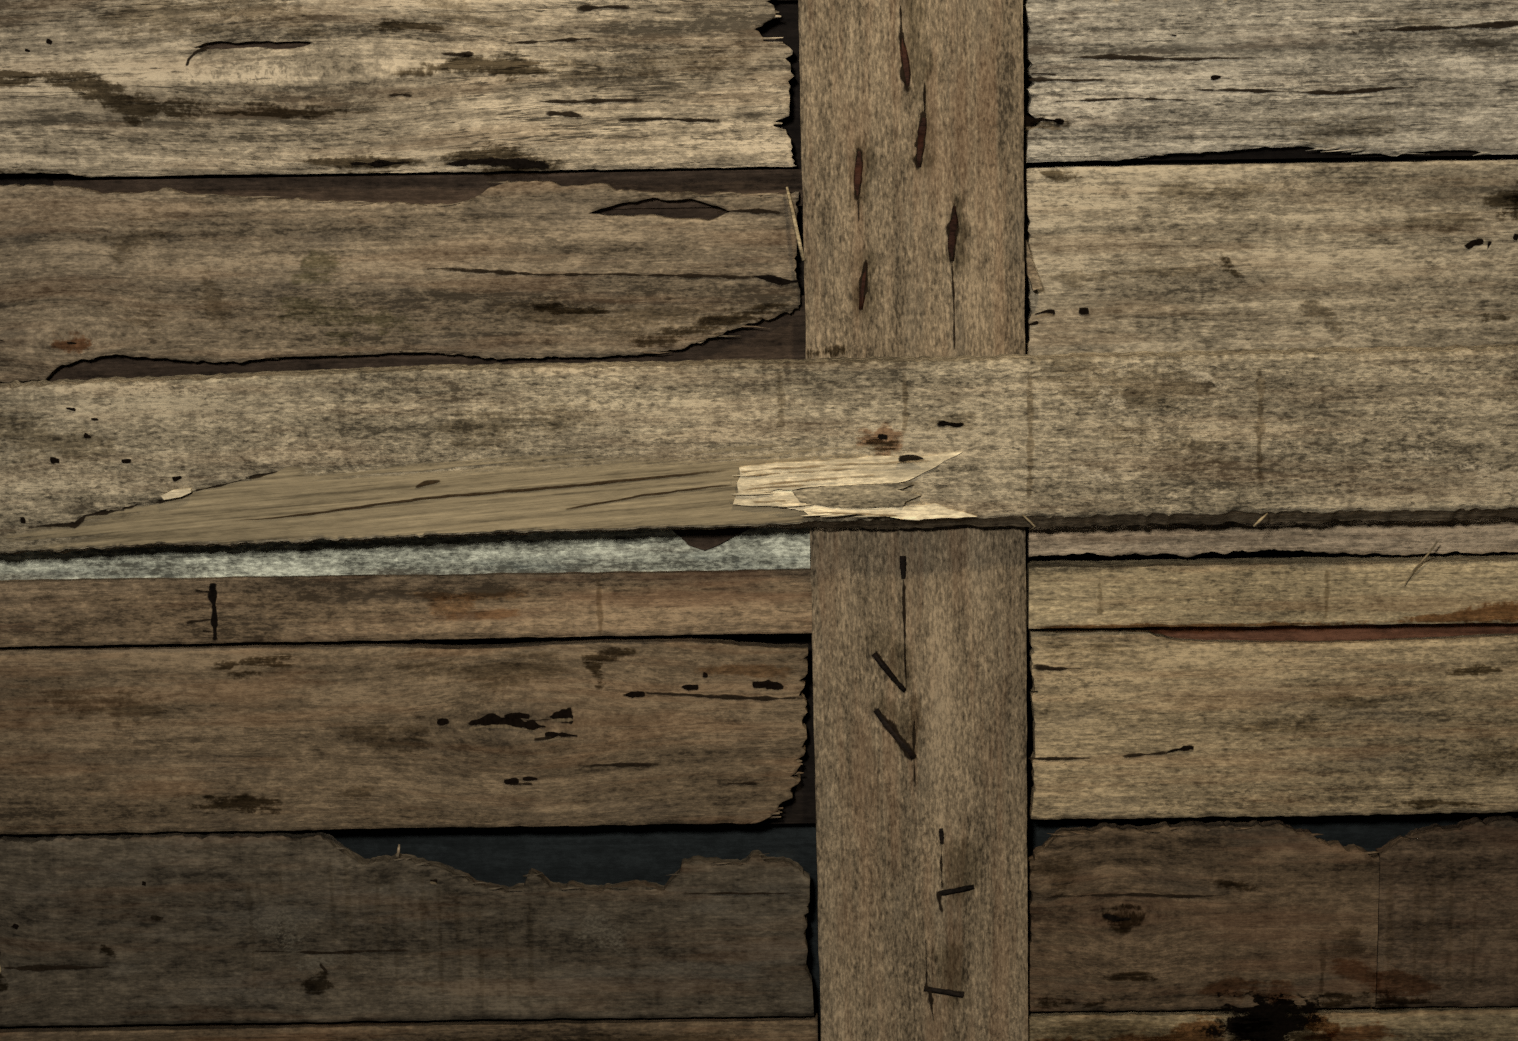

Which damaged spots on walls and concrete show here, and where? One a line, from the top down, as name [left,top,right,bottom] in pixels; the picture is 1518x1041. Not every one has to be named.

crack [186,47,210,65]
corrosion [898,6,926,168]
corrosion [854,148,862,221]
corrosion [859,260,868,304]
corrosion [946,205,959,349]
spalling [8,445,870,550]
corrosion [875,708,916,786]
corrosion [925,940,934,1021]